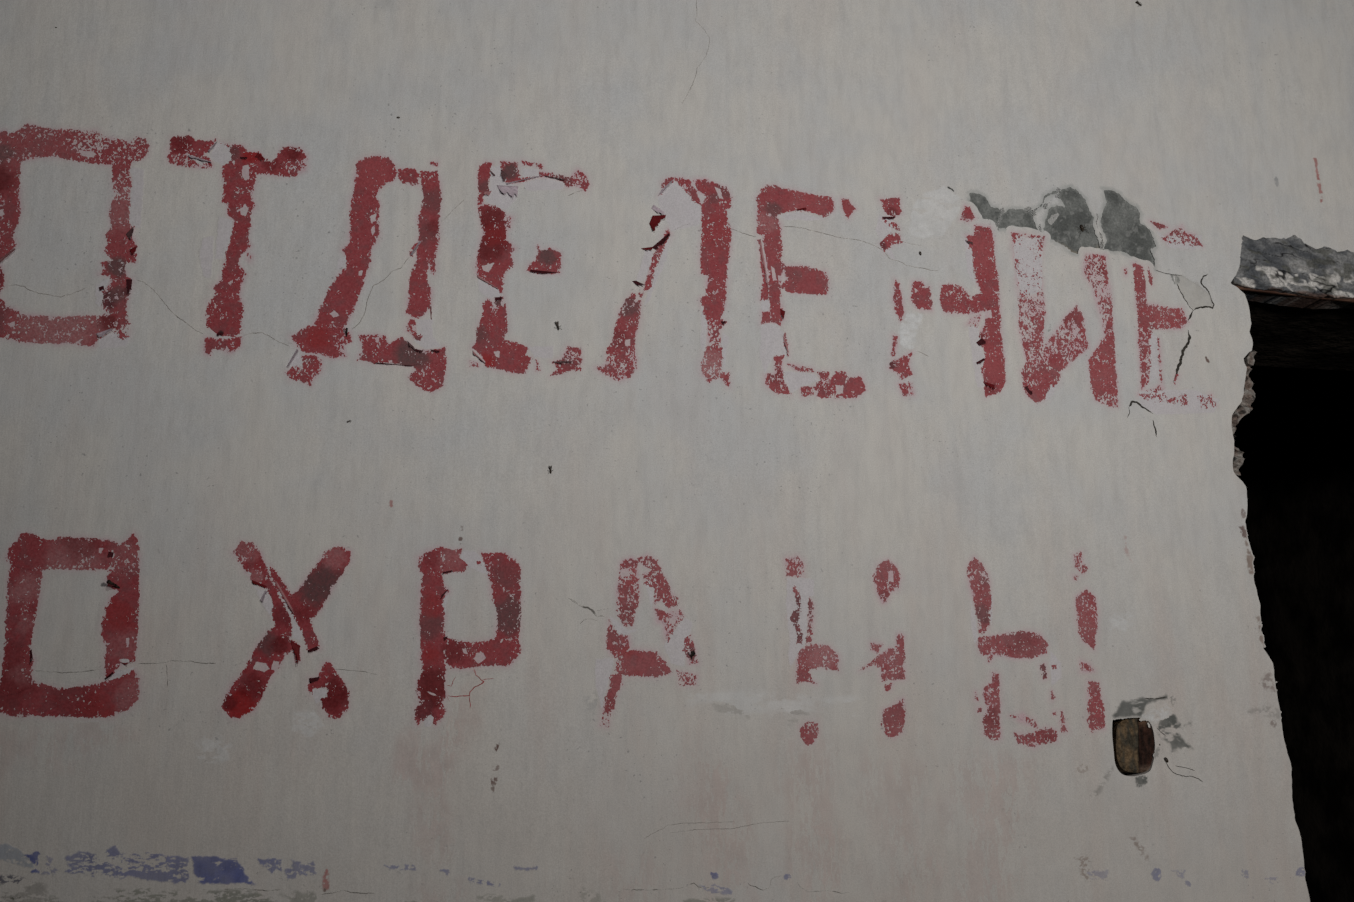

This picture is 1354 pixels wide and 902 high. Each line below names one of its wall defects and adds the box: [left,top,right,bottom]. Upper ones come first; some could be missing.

spalling [948,183,1203,298]
spalling [1231,236,1354,309]
spalling [1111,692,1195,759]
spalling [1133,774,1149,790]